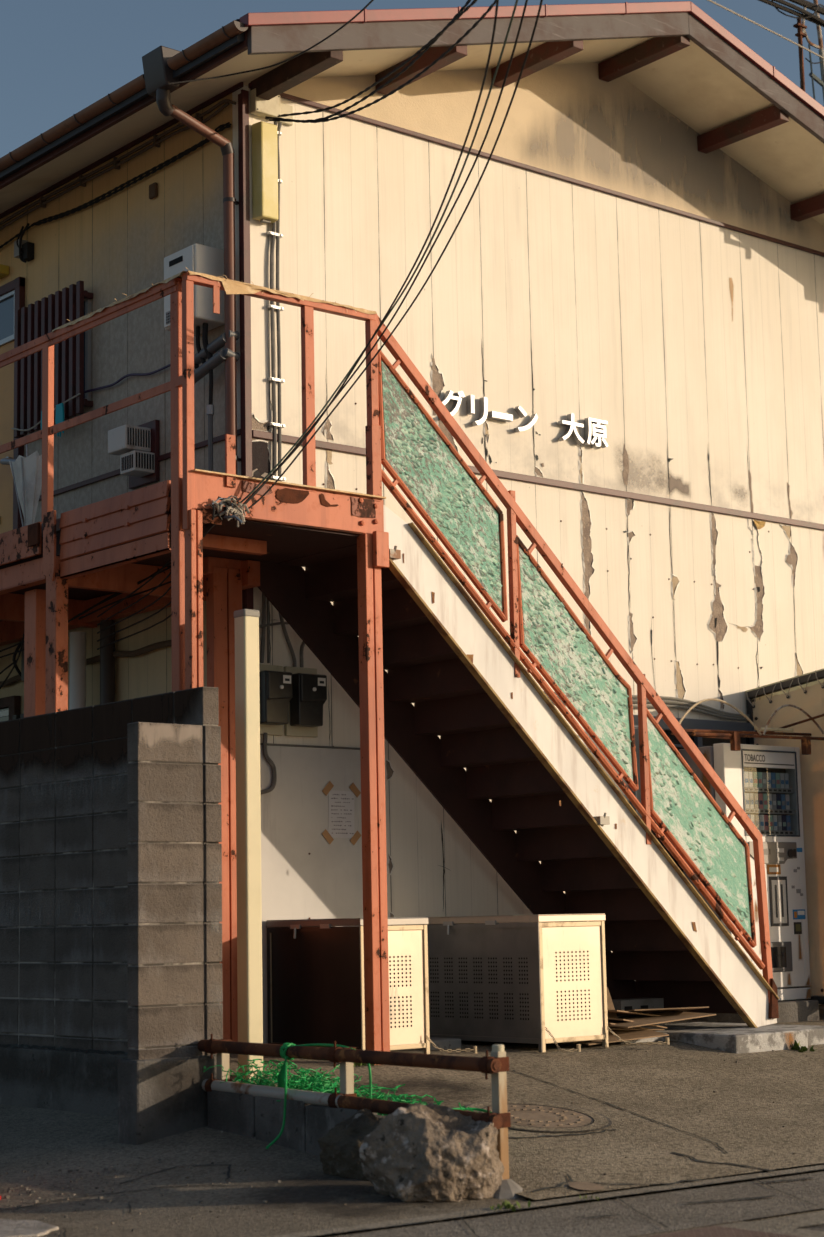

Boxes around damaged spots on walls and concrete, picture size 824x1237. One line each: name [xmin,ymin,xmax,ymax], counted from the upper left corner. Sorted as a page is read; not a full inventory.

water stain [531,105,791,223]
corrosion [197,508,222,525]
corrosion [243,481,376,518]
peeling [390,354,460,488]
peeling [421,472,502,601]
spalling [482,421,497,464]
peeling [521,447,632,764]
water stain [621,456,689,495]
spalling [707,512,728,643]
spalling [747,471,798,641]
crack [508,1070,823,1228]